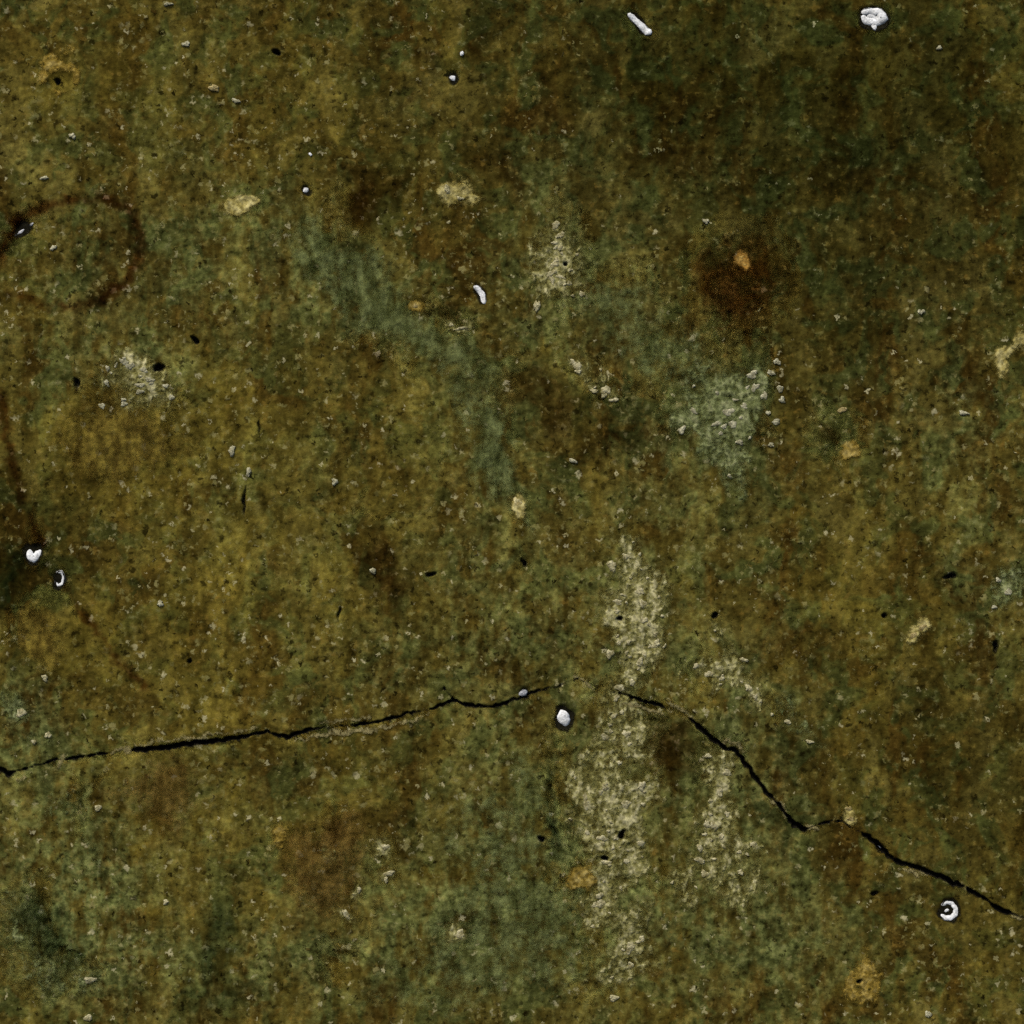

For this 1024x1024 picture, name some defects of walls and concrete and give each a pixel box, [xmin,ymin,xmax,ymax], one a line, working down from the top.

rust [734,251,750,271]
crack [0,675,1023,920]